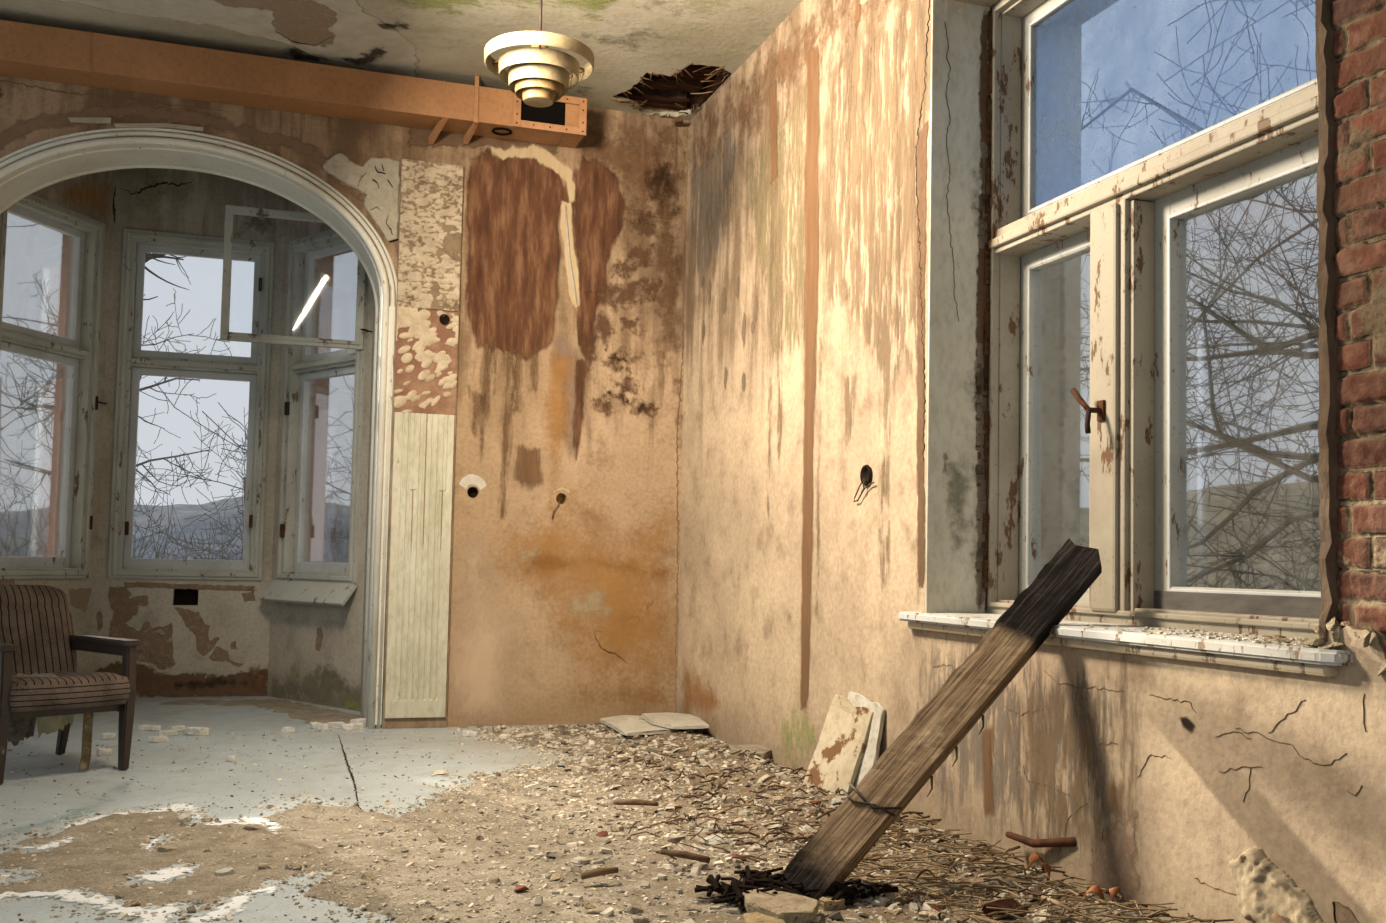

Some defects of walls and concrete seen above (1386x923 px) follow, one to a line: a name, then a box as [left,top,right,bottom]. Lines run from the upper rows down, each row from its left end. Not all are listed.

peeling [59,0,419,77]
flaking render [0,104,367,201]
flaking render [393,127,557,312]
crack [915,0,959,461]
damp [466,0,926,750]
flaking render [1313,0,1386,676]
damp [949,464,977,513]
peeling [69,582,255,670]
crack [1044,670,1114,691]
damp [934,668,1139,902]
crack [1152,694,1366,802]